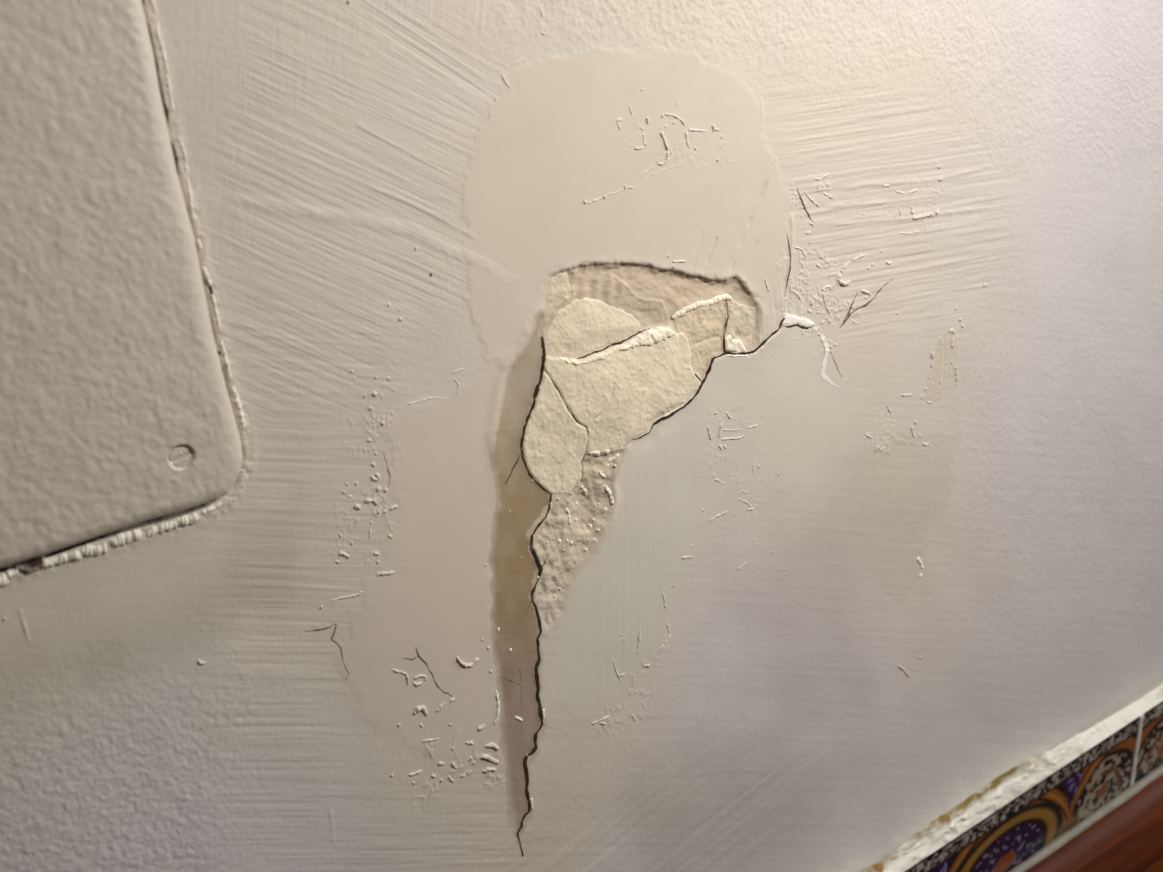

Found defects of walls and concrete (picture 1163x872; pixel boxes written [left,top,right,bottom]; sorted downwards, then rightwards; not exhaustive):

spalling [505,255,769,639]
peeling [790,250,892,336]
crack [494,494,552,857]